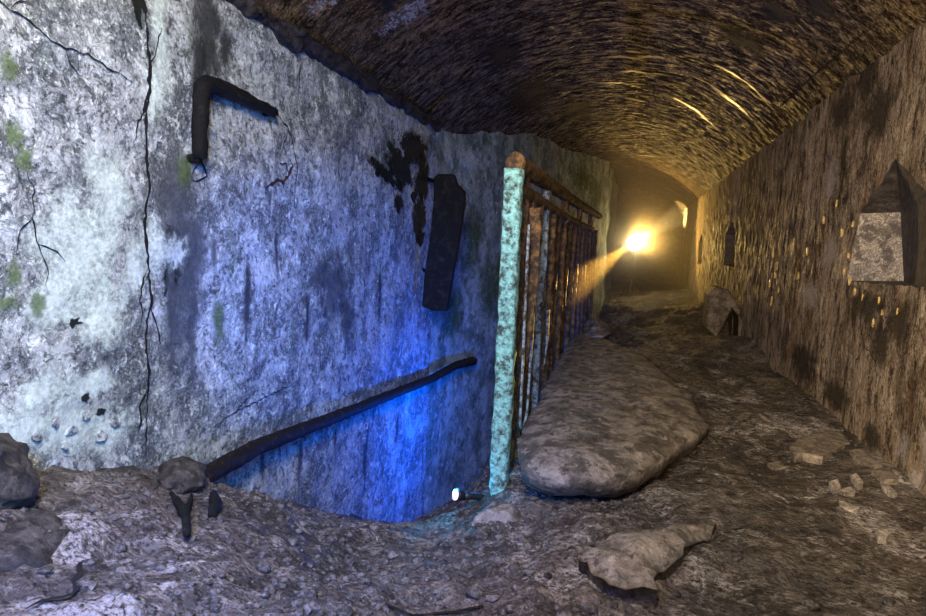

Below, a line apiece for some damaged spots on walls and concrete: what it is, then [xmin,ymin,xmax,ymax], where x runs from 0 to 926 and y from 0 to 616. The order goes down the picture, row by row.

crack [0,0,162,462]